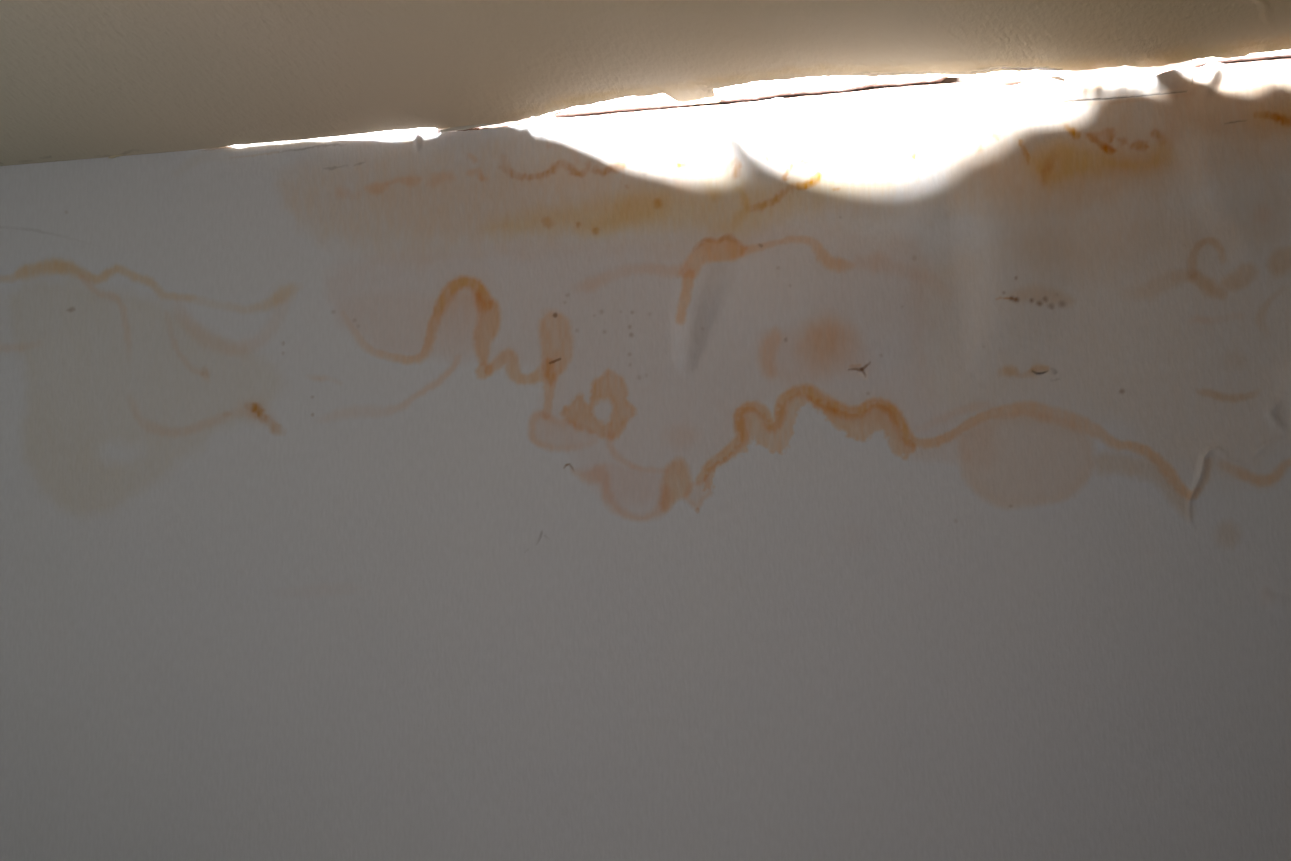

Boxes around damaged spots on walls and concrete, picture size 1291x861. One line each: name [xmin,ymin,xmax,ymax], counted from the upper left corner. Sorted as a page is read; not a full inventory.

damp [0,30,1291,535]